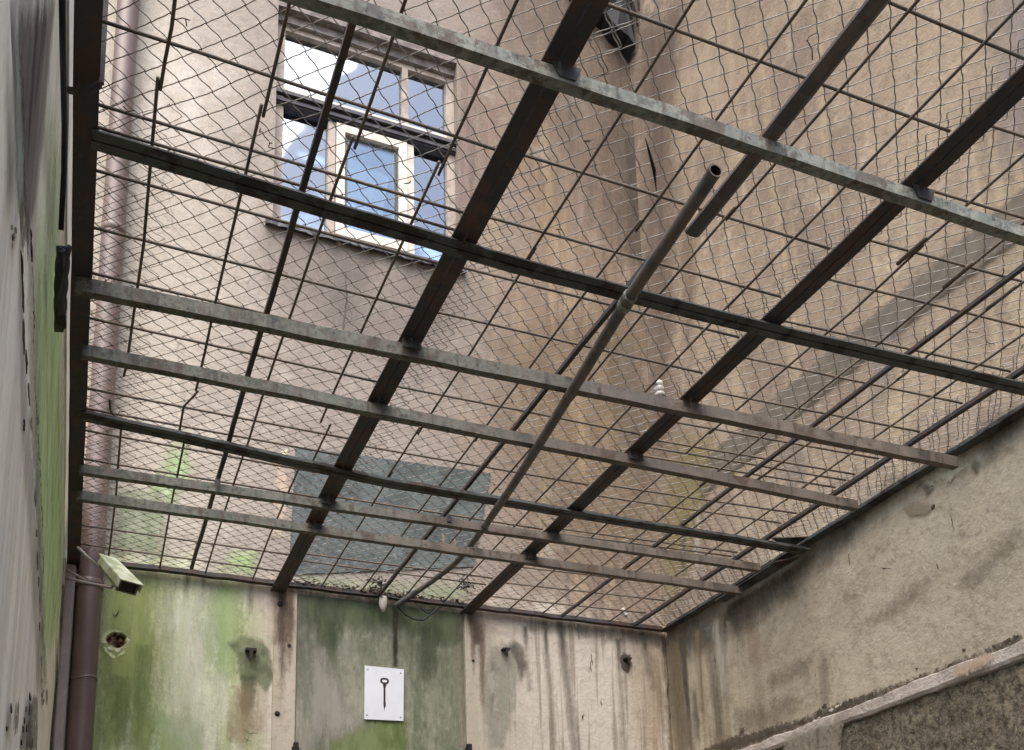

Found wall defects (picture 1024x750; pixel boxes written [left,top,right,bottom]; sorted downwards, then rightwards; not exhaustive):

spalling [98,623,131,654]
water stain [610,515,864,750]
water stain [511,642,526,676]
water stain [241,677,254,712]